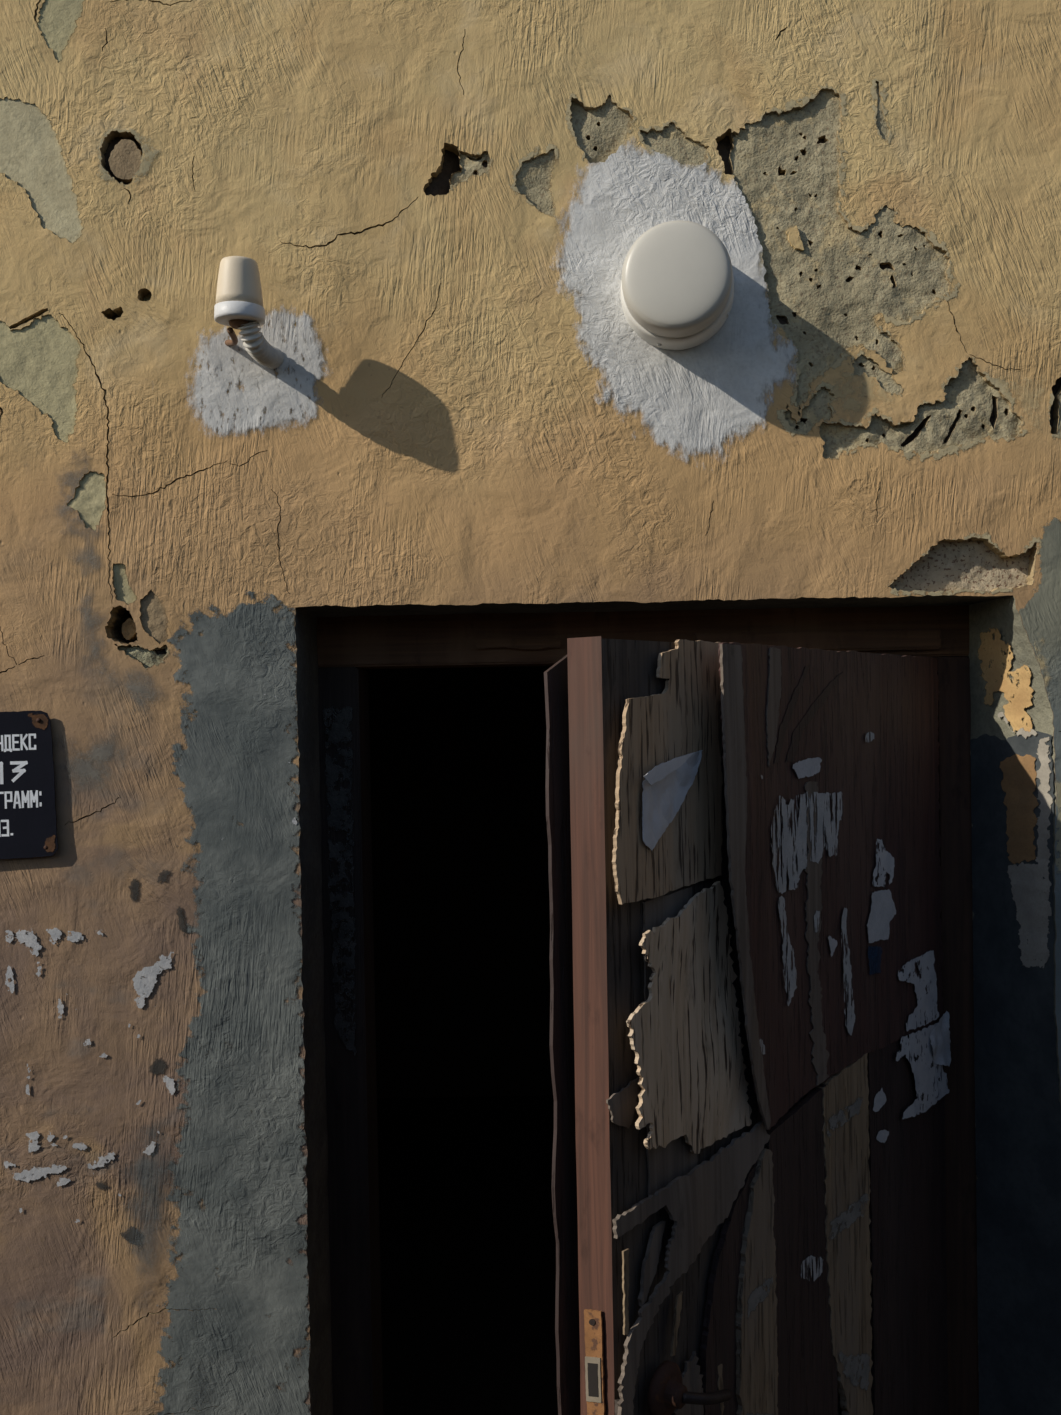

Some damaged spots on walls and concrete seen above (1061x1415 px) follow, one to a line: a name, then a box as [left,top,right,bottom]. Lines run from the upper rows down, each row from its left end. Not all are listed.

peeling [38,0,84,62]
peeling [0,96,83,243]
spalling [423,142,492,196]
spalling [509,144,559,217]
crack [280,197,418,248]
spalling [565,75,1027,462]
peeling [0,308,81,443]
spalling [1048,393,1061,439]
spalling [887,532,1042,596]